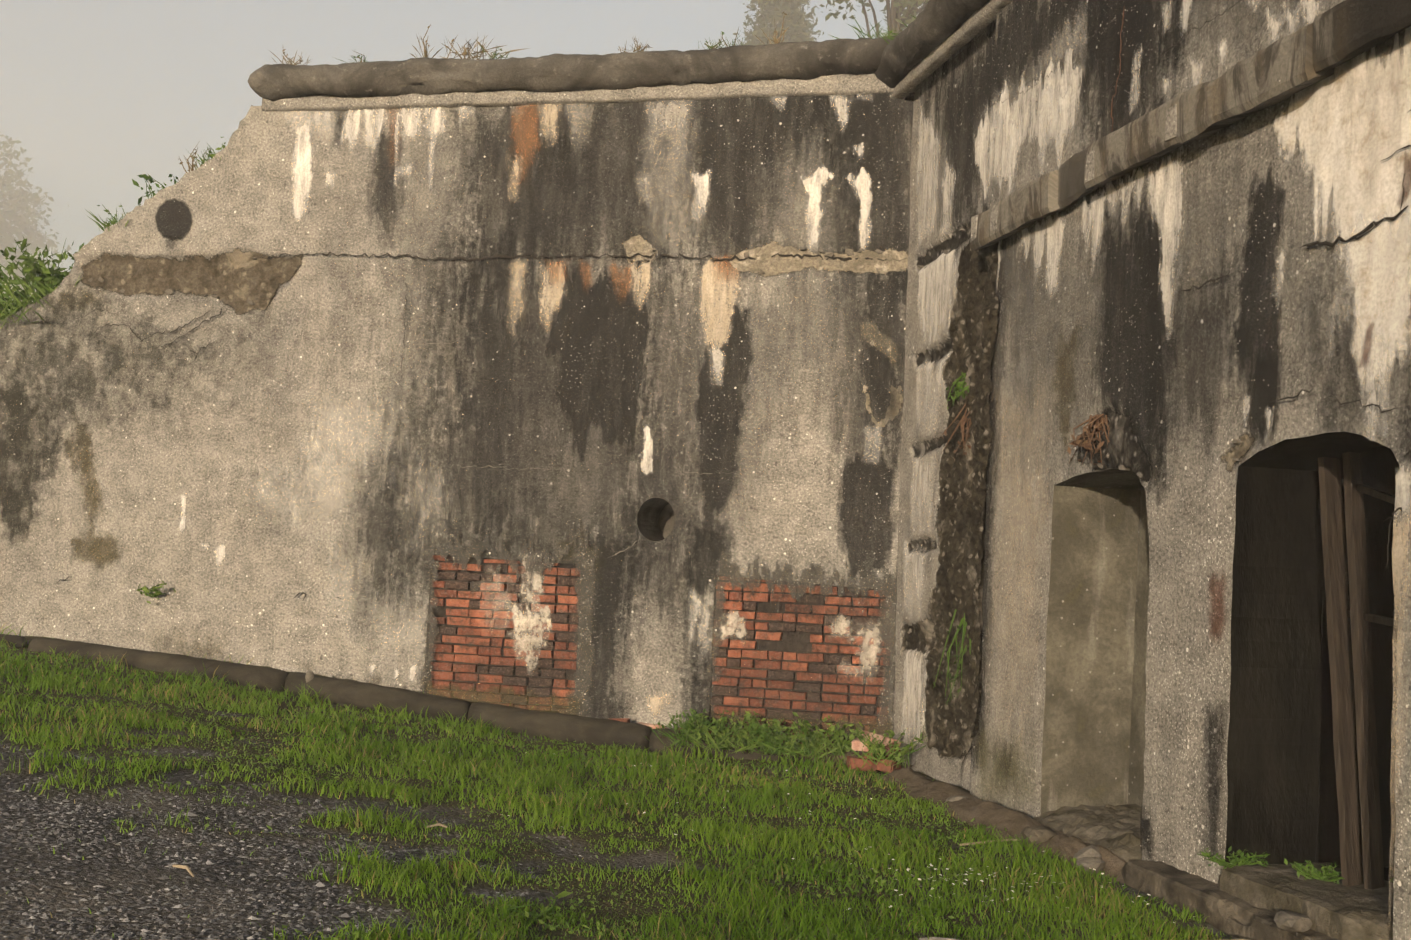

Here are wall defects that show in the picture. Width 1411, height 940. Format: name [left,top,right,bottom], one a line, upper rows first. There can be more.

leakage [1267,0,1315,39]
corrosion [512,104,560,170]
crack [1300,109,1411,248]
spalling [80,248,303,315]
leakage [425,0,1202,727]
leakage [1330,305,1357,396]
leakage [0,380,59,542]
leakage [357,466,411,597]
spalling [706,223,999,759]
leakage [962,145,1298,781]
peeling [420,519,601,716]